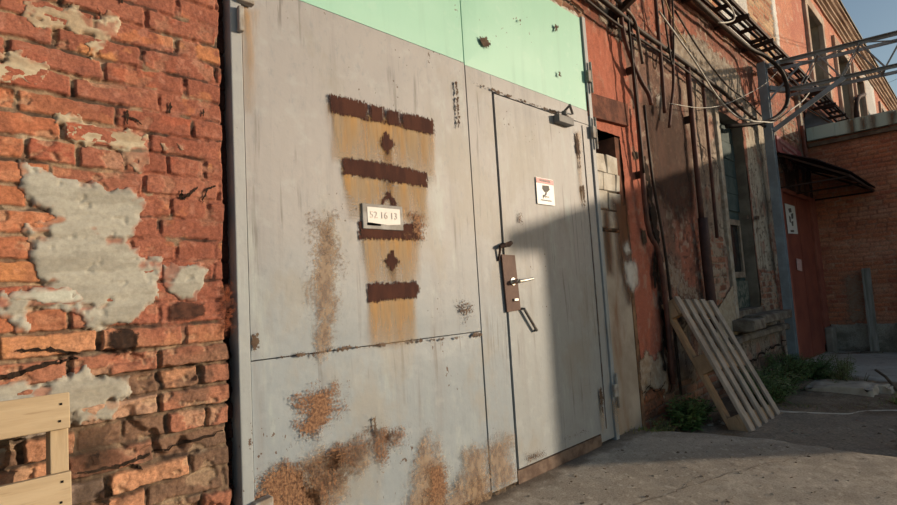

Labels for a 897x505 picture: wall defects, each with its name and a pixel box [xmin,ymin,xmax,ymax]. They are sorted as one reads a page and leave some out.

spalling [21,0,122,60]
spalling [0,49,51,85]
peeling [8,287,83,304]
peeling [161,262,209,321]
corrosion [306,214,340,358]
peeling [667,255,700,299]
spalling [710,236,728,306]
peeling [640,351,669,416]
corrosion [254,380,516,505]